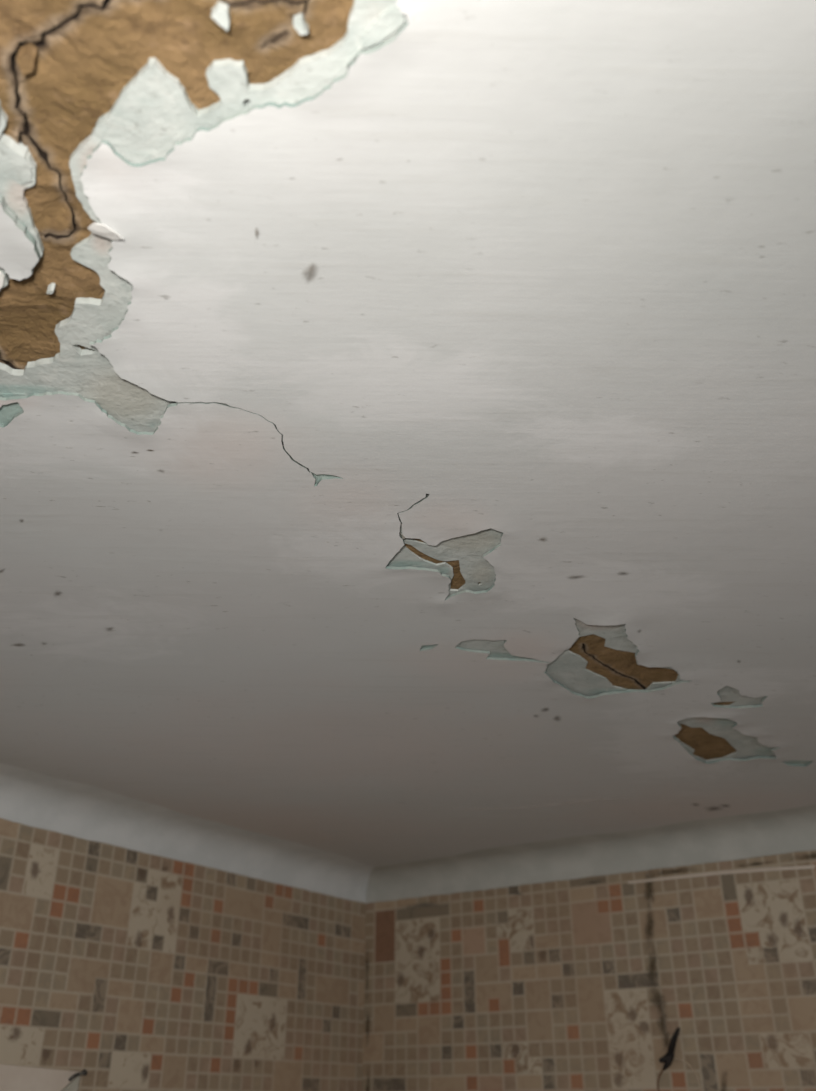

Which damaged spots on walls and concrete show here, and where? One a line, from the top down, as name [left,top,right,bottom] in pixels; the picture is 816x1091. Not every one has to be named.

spalling [0,0,408,432]
spalling [387,513,502,597]
spalling [457,639,532,659]
spalling [545,619,683,696]
spalling [673,686,811,765]